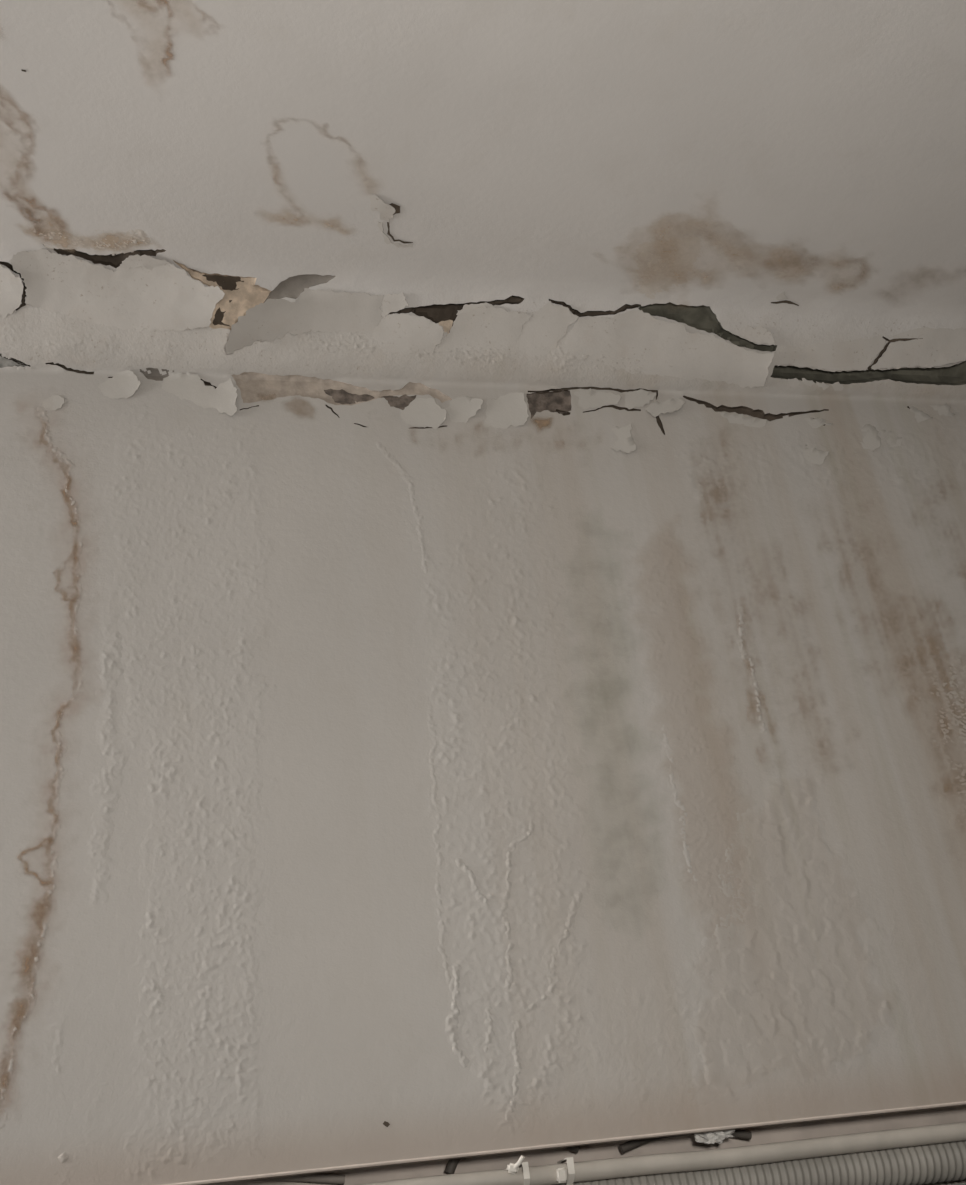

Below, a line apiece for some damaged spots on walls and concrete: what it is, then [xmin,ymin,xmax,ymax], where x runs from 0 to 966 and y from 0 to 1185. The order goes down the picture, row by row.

crack [0,261,27,311]
crack [43,244,166,268]
peeling [0,223,966,391]
crack [389,295,777,352]
leakage [634,231,704,305]
crack [771,292,799,306]
crack [14,359,112,378]
spalling [98,368,687,429]
crack [528,387,829,435]
peeling [720,413,767,428]